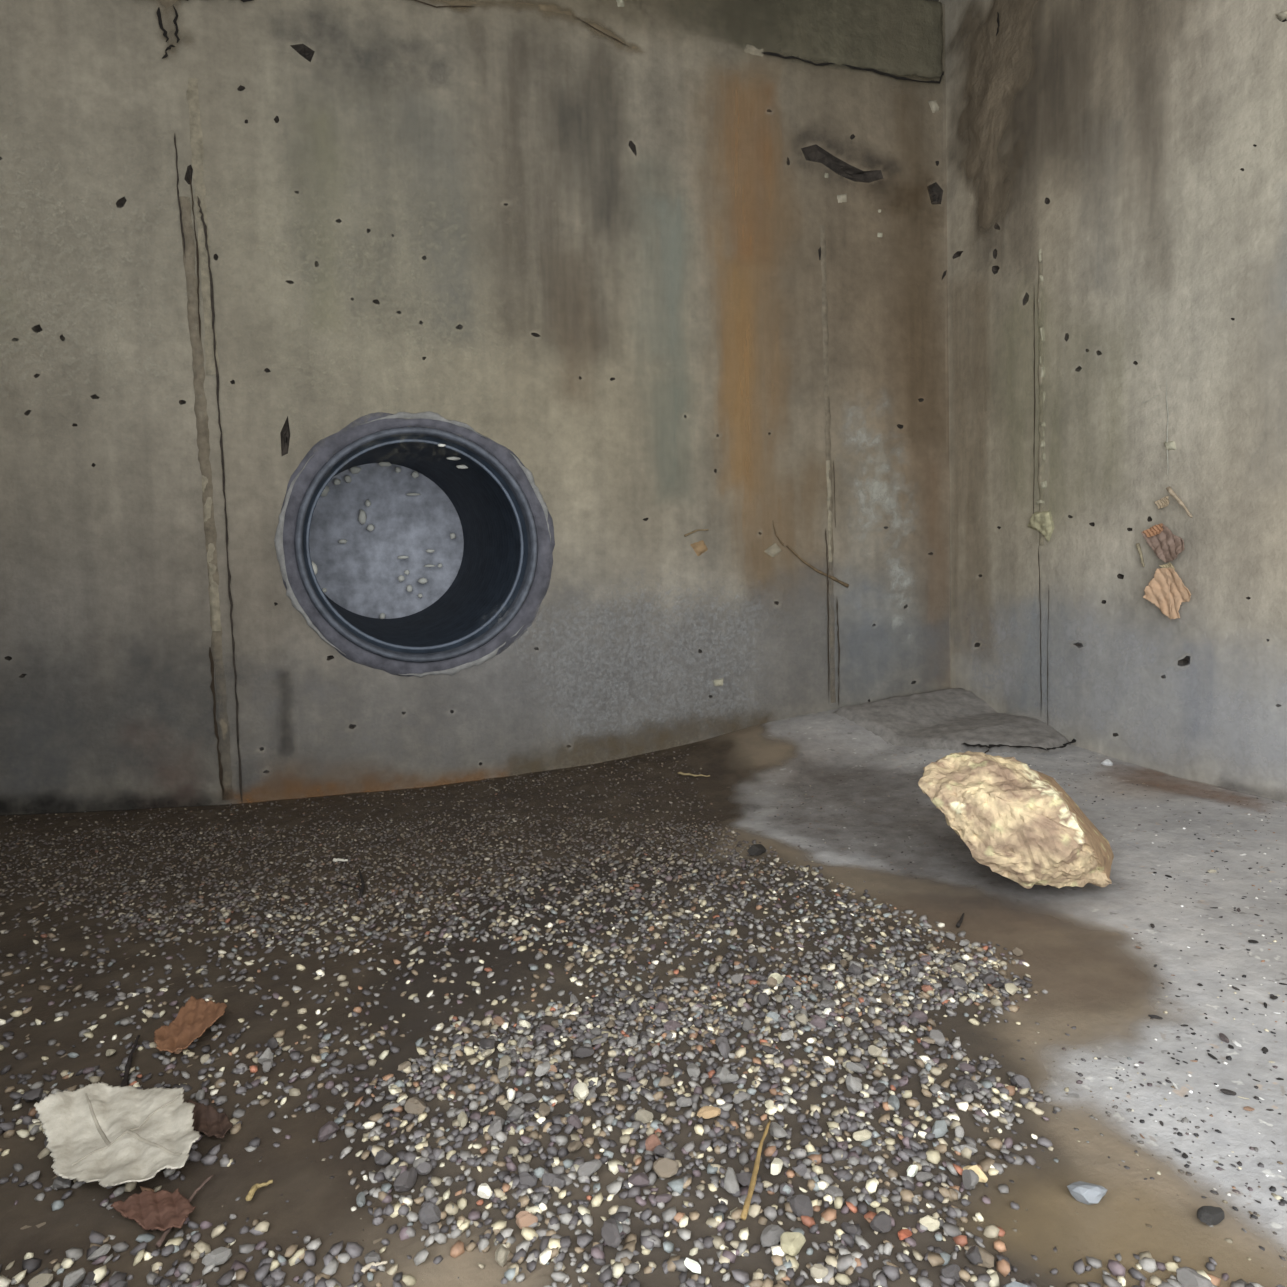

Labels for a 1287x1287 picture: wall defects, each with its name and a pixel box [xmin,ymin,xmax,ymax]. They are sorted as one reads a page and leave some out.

crack [414,0,474,8]
crack [575,17,630,47]
spalling [786,144,883,183]